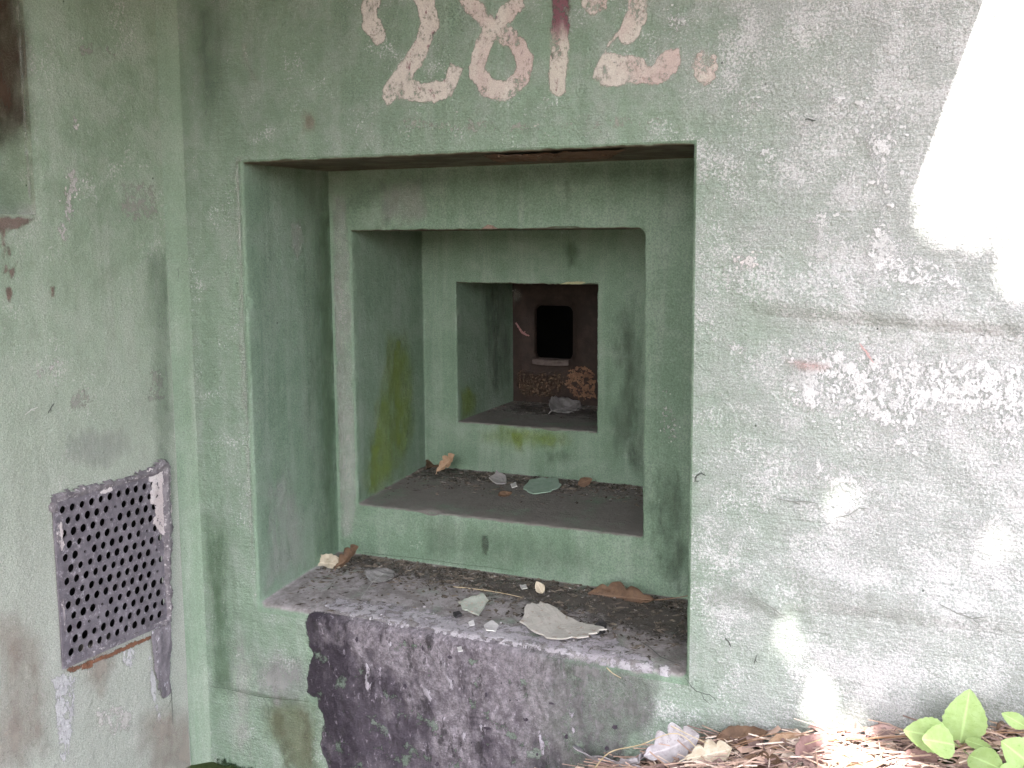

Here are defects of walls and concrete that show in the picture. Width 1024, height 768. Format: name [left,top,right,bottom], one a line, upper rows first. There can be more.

corrosion [0,217,29,301]
peeling [781,332,1024,468]
corrosion [67,636,151,673]